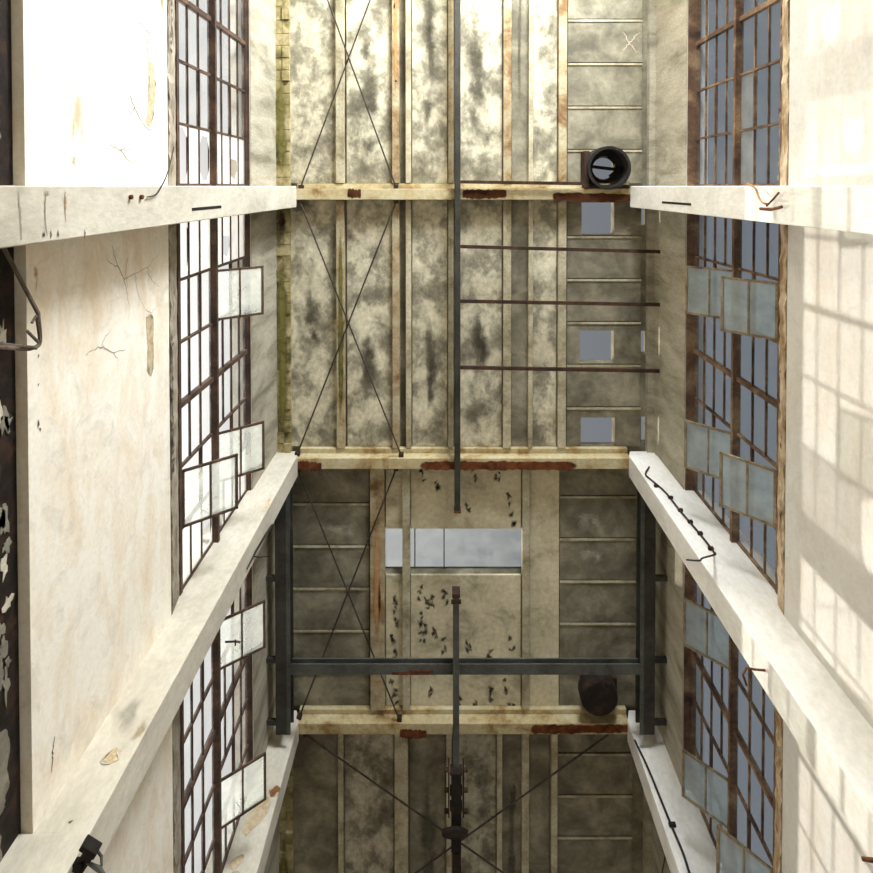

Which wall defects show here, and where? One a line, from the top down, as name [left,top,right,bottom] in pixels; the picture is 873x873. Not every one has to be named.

damp [362,81,376,113]
damp [424,0,434,68]
damp [469,31,483,97]
spalling [0,248,42,357]
crack [106,247,157,313]
crack [86,329,124,361]
rust [298,461,322,471]
rust [421,461,576,471]
peeling [0,503,12,583]
peeling [0,593,15,709]
rust [531,724,628,734]
peeling [0,729,10,815]